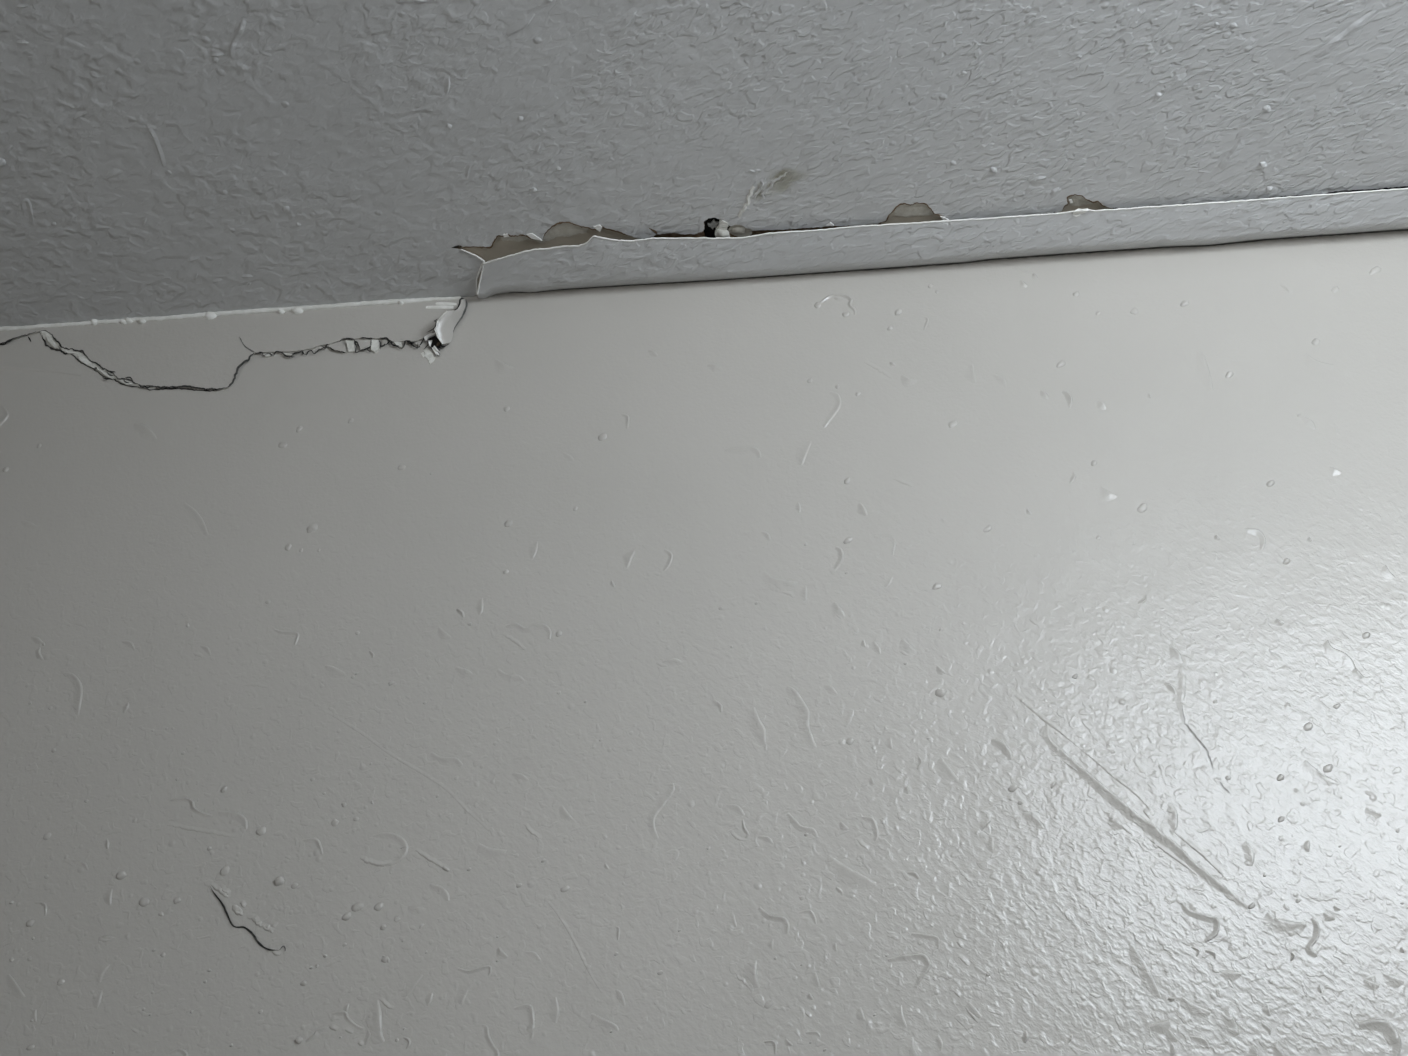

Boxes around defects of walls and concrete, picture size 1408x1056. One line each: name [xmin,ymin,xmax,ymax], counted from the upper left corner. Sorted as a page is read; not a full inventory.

crack [0,330,449,392]
peeling [0,188,1408,390]